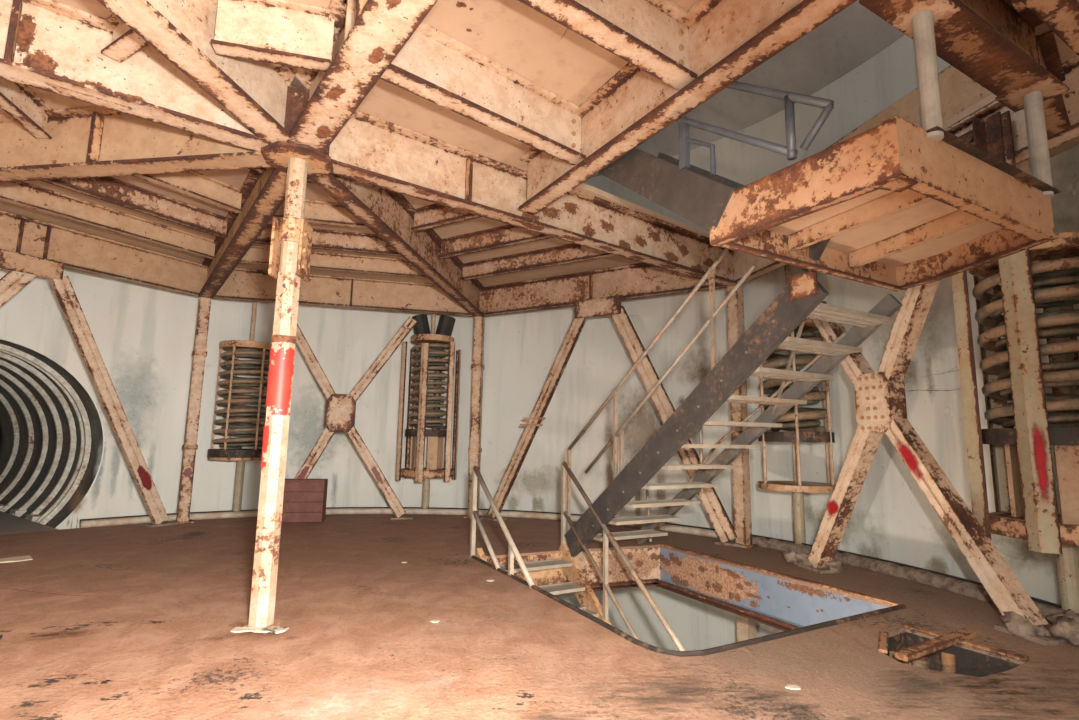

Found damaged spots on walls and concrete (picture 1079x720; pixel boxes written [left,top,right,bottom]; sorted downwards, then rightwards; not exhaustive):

corrosion [366,47,387,66]
corrosion [324,84,346,101]
corrosion [315,125,333,139]
peeling [582,550,770,608]
peeling [777,580,851,612]